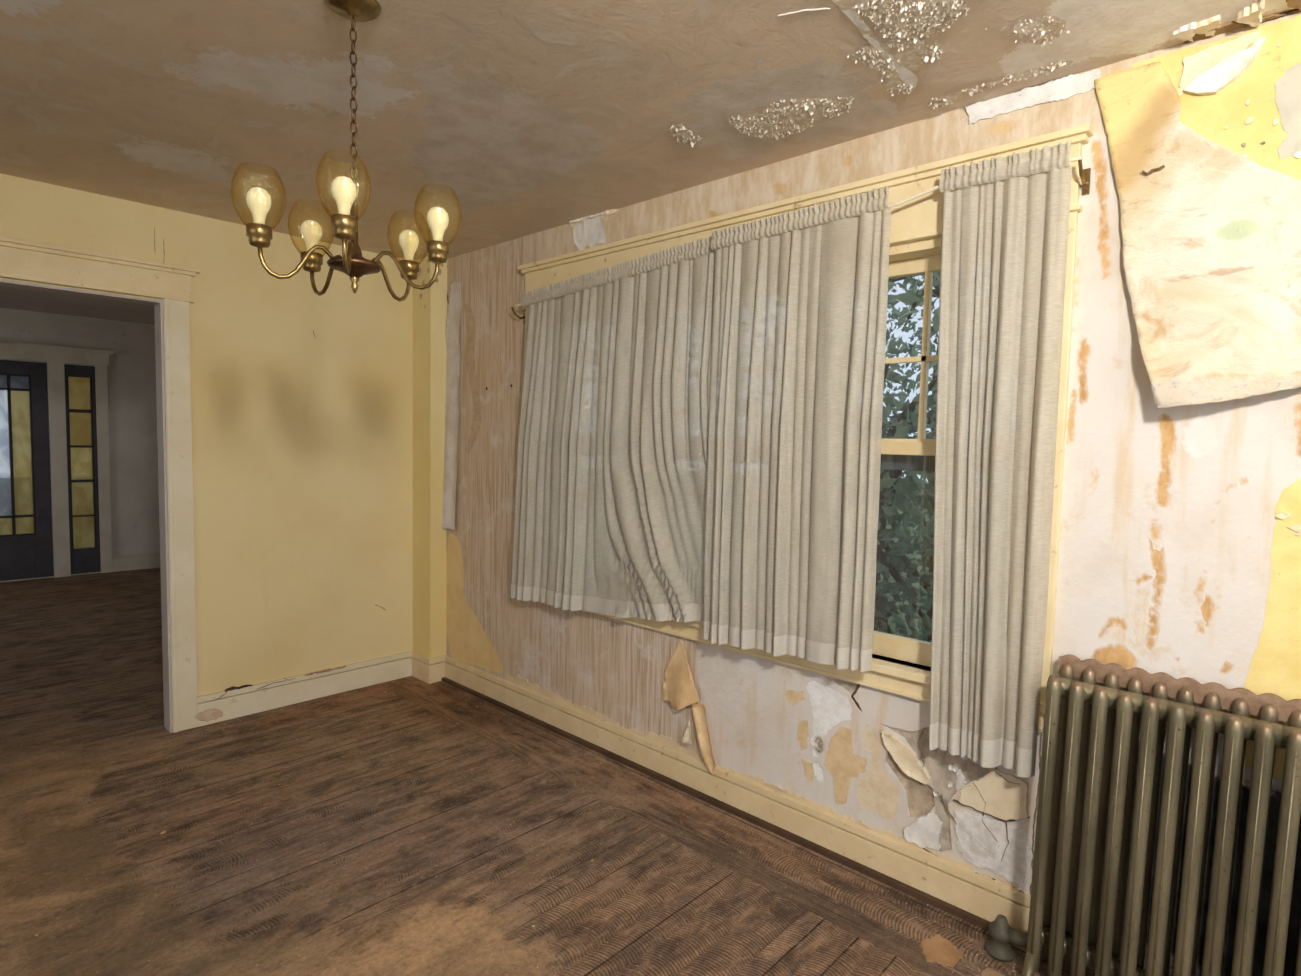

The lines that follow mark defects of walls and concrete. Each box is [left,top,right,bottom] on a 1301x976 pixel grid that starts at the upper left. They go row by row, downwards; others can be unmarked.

water stain [1065,137,1114,451]
peeling [662,640,716,775]
flaking render [785,679,1030,888]
crack [975,733,1042,895]
water stain [1080,412,1182,679]
water stain [1190,568,1225,646]
water stain [1217,657,1240,680]